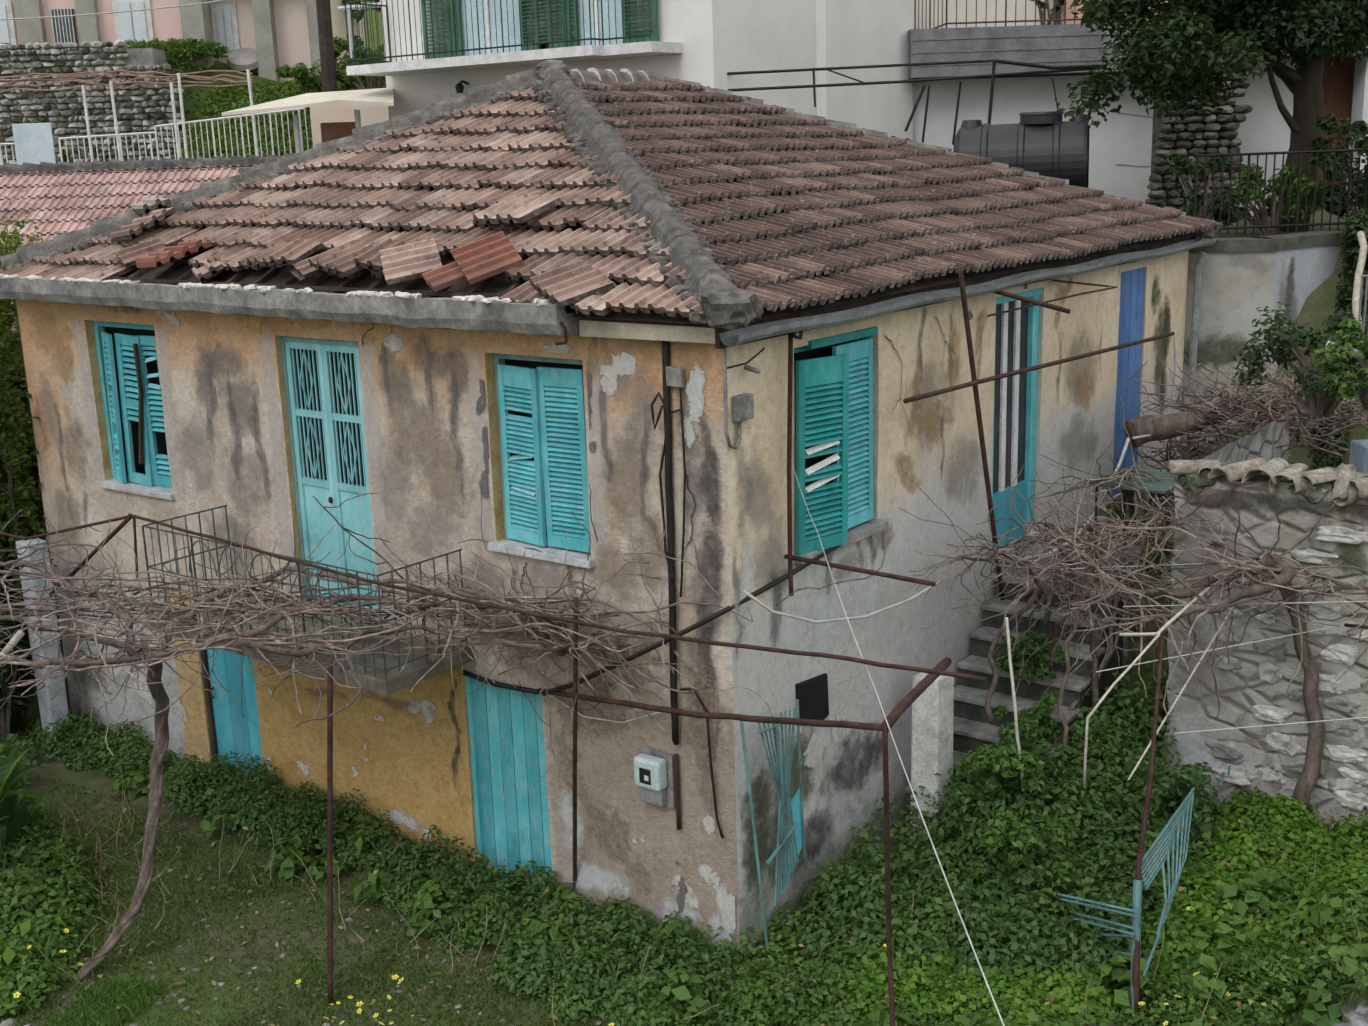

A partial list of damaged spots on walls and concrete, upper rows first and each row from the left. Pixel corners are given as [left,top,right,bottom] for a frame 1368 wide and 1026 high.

peeling [542,343,571,354]
leakage [949,316,959,381]
leakage [198,346,268,497]
leakage [382,346,467,462]
peeling [586,352,637,453]
peeling [680,363,706,449]
peeling [407,699,436,724]
leakage [831,733,883,789]
spalling [703,813,716,836]
leakage [740,740,811,885]
leakage [796,810,831,871]
spalling [671,864,736,935]